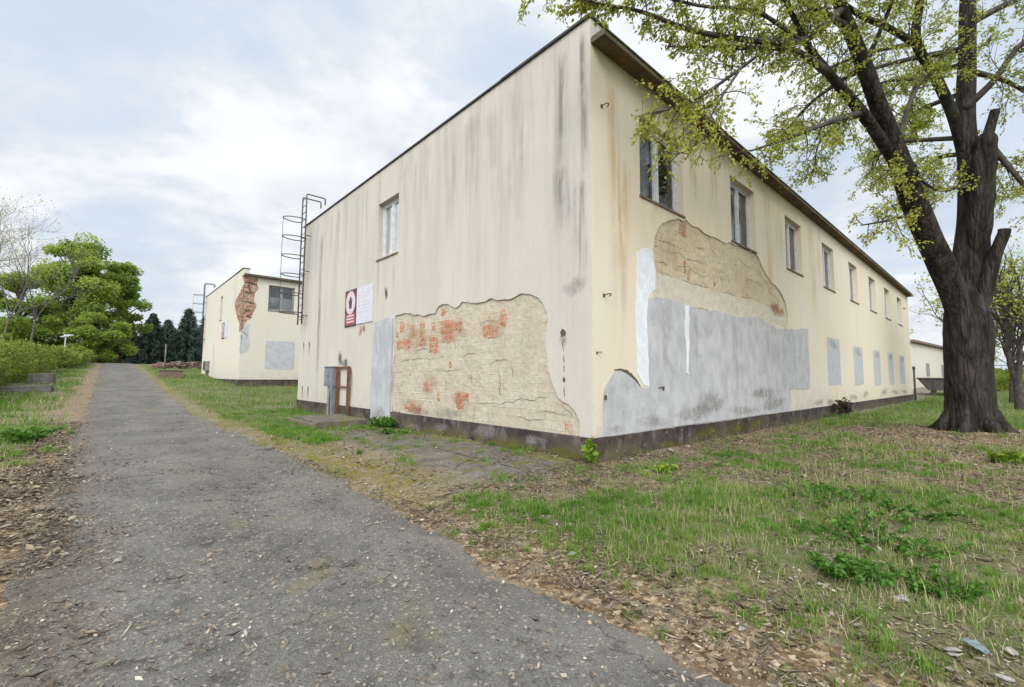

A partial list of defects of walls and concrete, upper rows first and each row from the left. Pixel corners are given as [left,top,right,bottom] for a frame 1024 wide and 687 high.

spalling [234,275,259,332]
spalling [653,219,787,329]
spalling [393,294,580,436]